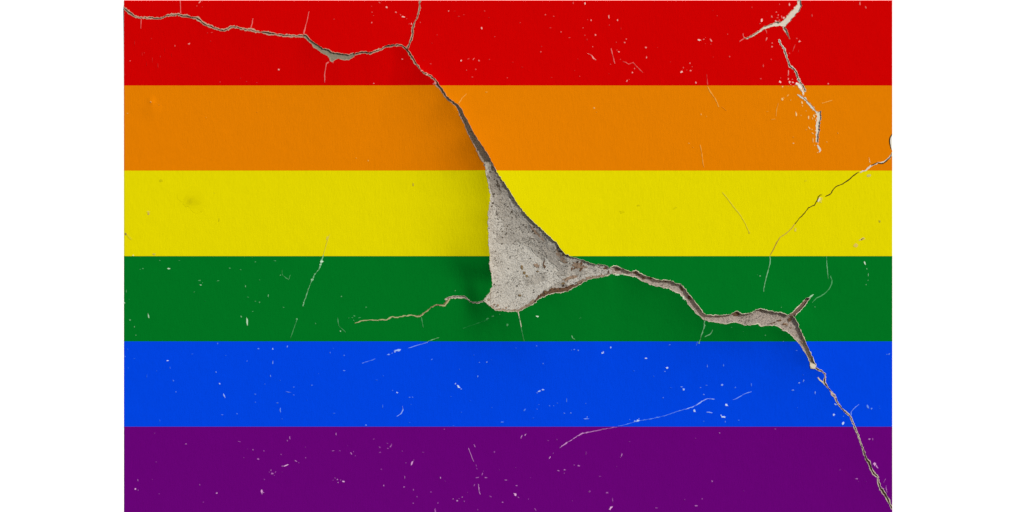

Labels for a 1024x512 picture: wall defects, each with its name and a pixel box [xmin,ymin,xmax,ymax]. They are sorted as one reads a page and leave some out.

crack [124,1,309,37]
crack [354,0,494,166]
crack [740,29,818,113]
crack [303,234,330,306]
crack [356,296,483,324]
spalling [483,162,624,317]
crack [610,265,707,346]
crack [790,256,832,316]
crack [763,134,892,292]
crack [815,367,892,509]